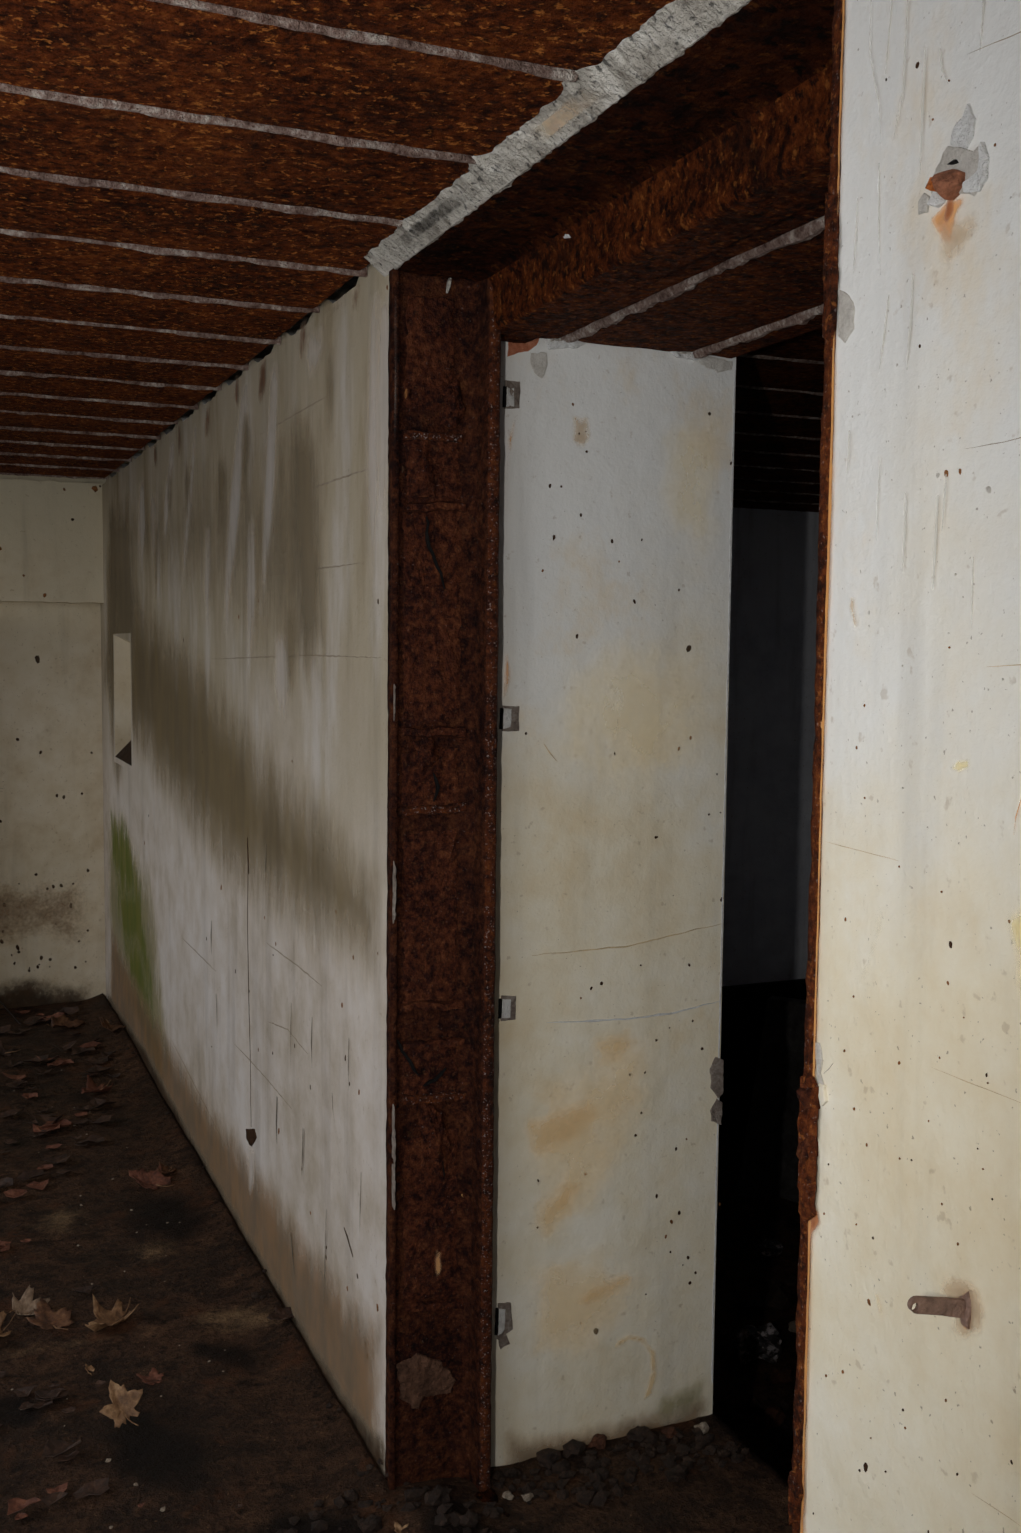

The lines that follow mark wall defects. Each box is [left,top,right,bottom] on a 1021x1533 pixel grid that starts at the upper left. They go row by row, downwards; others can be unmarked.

corrosion [934,200,965,243]
flaking render [918,103,996,215]
water stain [370,315,389,516]
water stain [106,375,371,948]
water stain [111,813,156,1029]
corrosion [946,1284,979,1331]